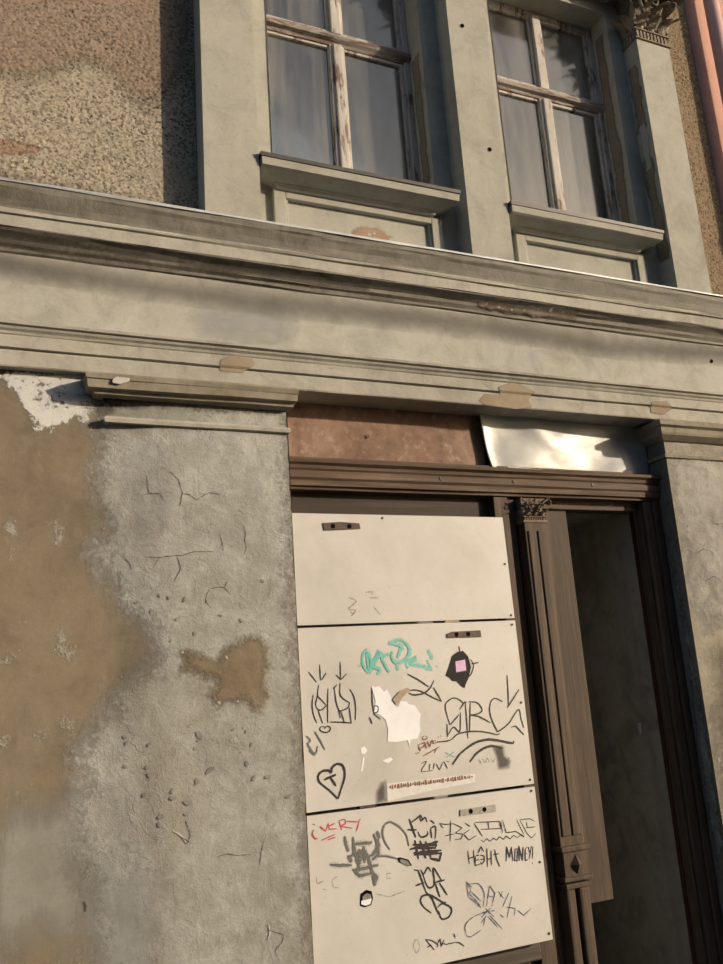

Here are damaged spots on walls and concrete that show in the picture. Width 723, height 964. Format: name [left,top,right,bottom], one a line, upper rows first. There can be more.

peeling [629,66,669,263]
crack [145,471,219,506]
crack [123,527,247,581]
peeling [0,370,313,964]